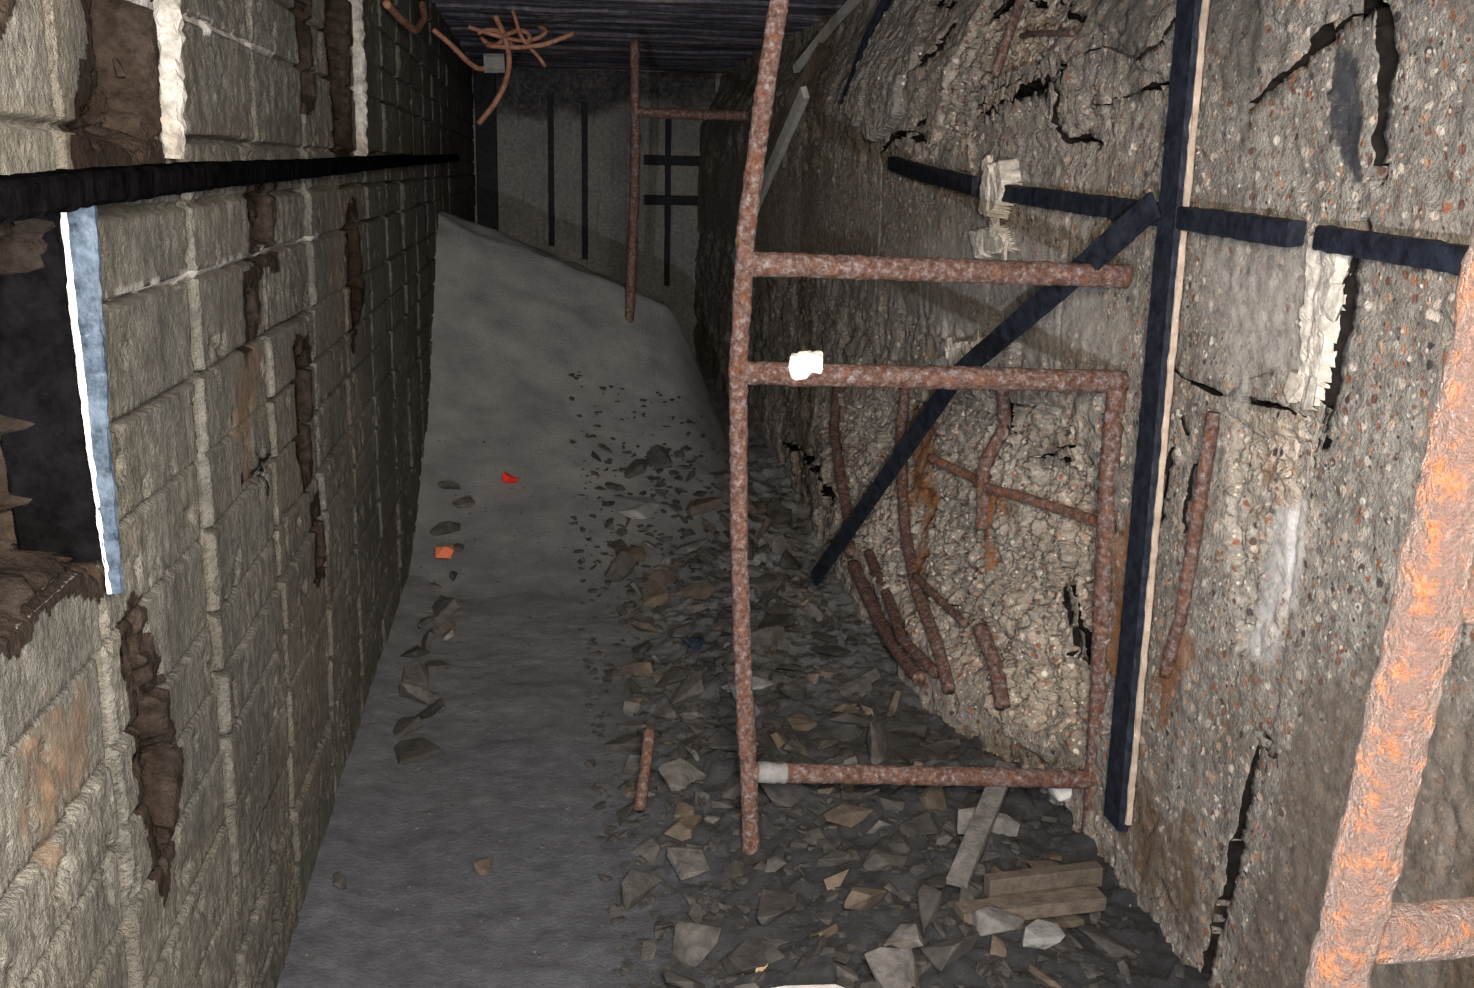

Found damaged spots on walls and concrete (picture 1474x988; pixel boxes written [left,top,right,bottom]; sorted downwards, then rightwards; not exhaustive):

spalling [0,0,17,40]
crack [877,0,1176,164]
crack [1247,0,1404,169]
spalling [0,217,56,275]
spalling [0,415,107,660]
corrosion [911,428,939,573]
spalling [116,591,184,908]